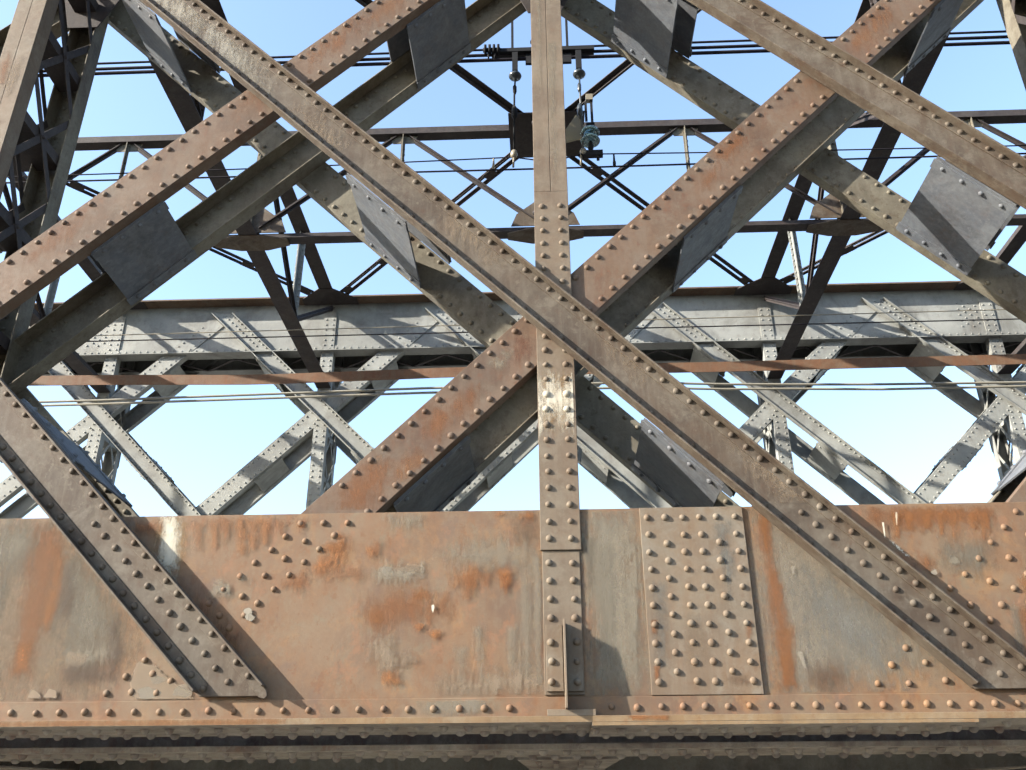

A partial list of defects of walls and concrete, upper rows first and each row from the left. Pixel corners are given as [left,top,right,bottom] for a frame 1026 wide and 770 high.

corrosion [759,519,795,686]